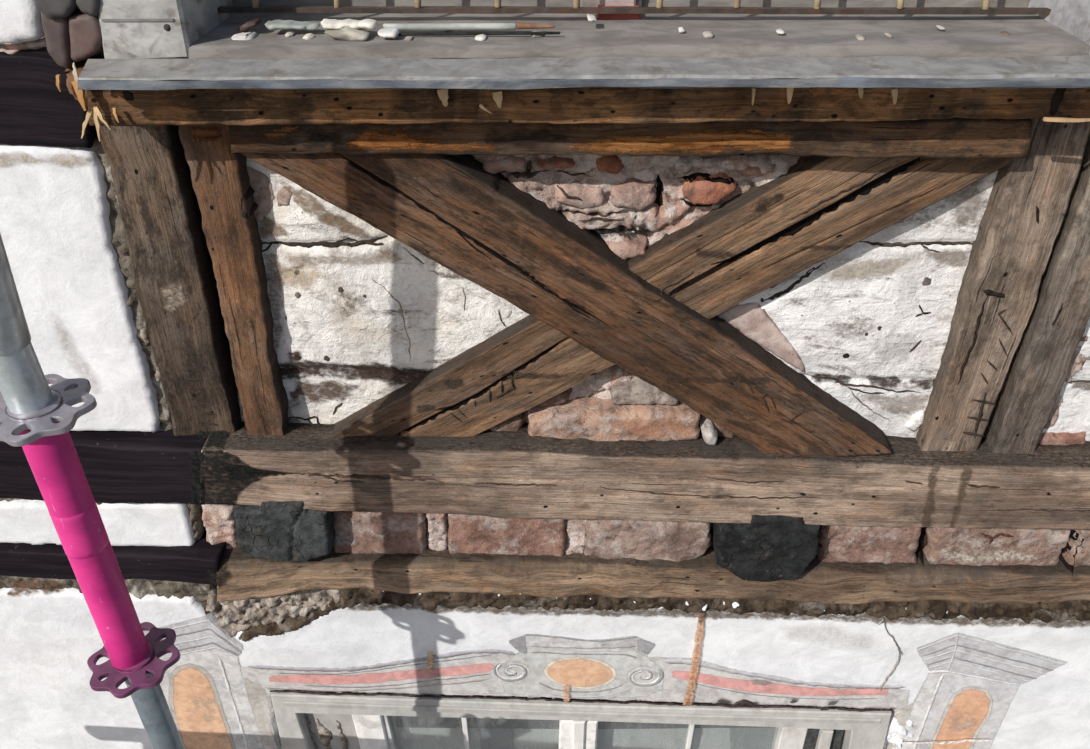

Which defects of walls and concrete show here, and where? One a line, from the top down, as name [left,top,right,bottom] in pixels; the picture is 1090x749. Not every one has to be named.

crack [262,236,424,264]
crack [653,157,920,302]
crack [860,241,973,253]
crack [758,263,921,422]
crack [966,484,1090,576]
spalling [206,589,341,642]
crack [270,617,903,712]
rust [683,613,705,705]
peeling [306,716,348,749]